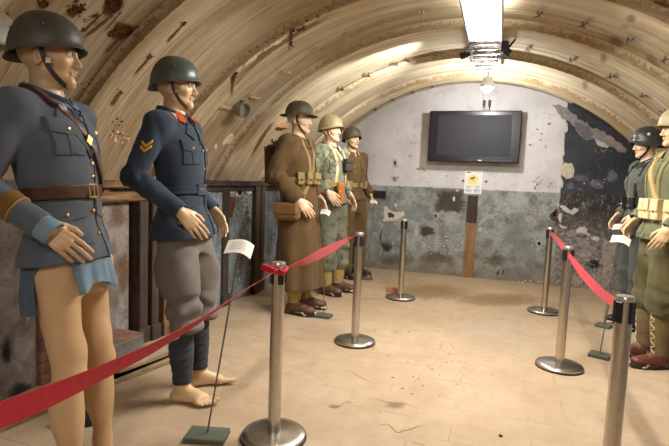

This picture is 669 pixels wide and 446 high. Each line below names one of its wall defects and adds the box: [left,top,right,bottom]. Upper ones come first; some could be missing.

peeling [552,104,627,165]
spalling [379,203,461,256]
peeling [433,190,465,220]